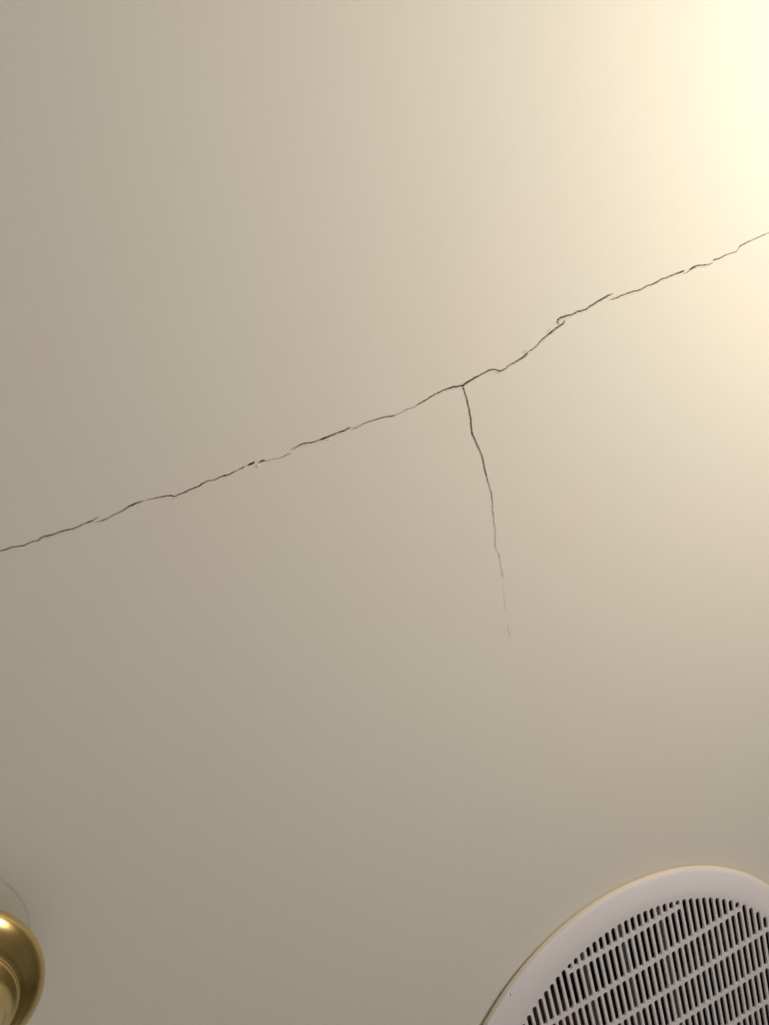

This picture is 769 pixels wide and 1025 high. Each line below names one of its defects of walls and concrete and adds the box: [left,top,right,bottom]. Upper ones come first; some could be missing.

crack [381,243,746,494]
crack [291,428,352,452]
crack [0,460,265,554]